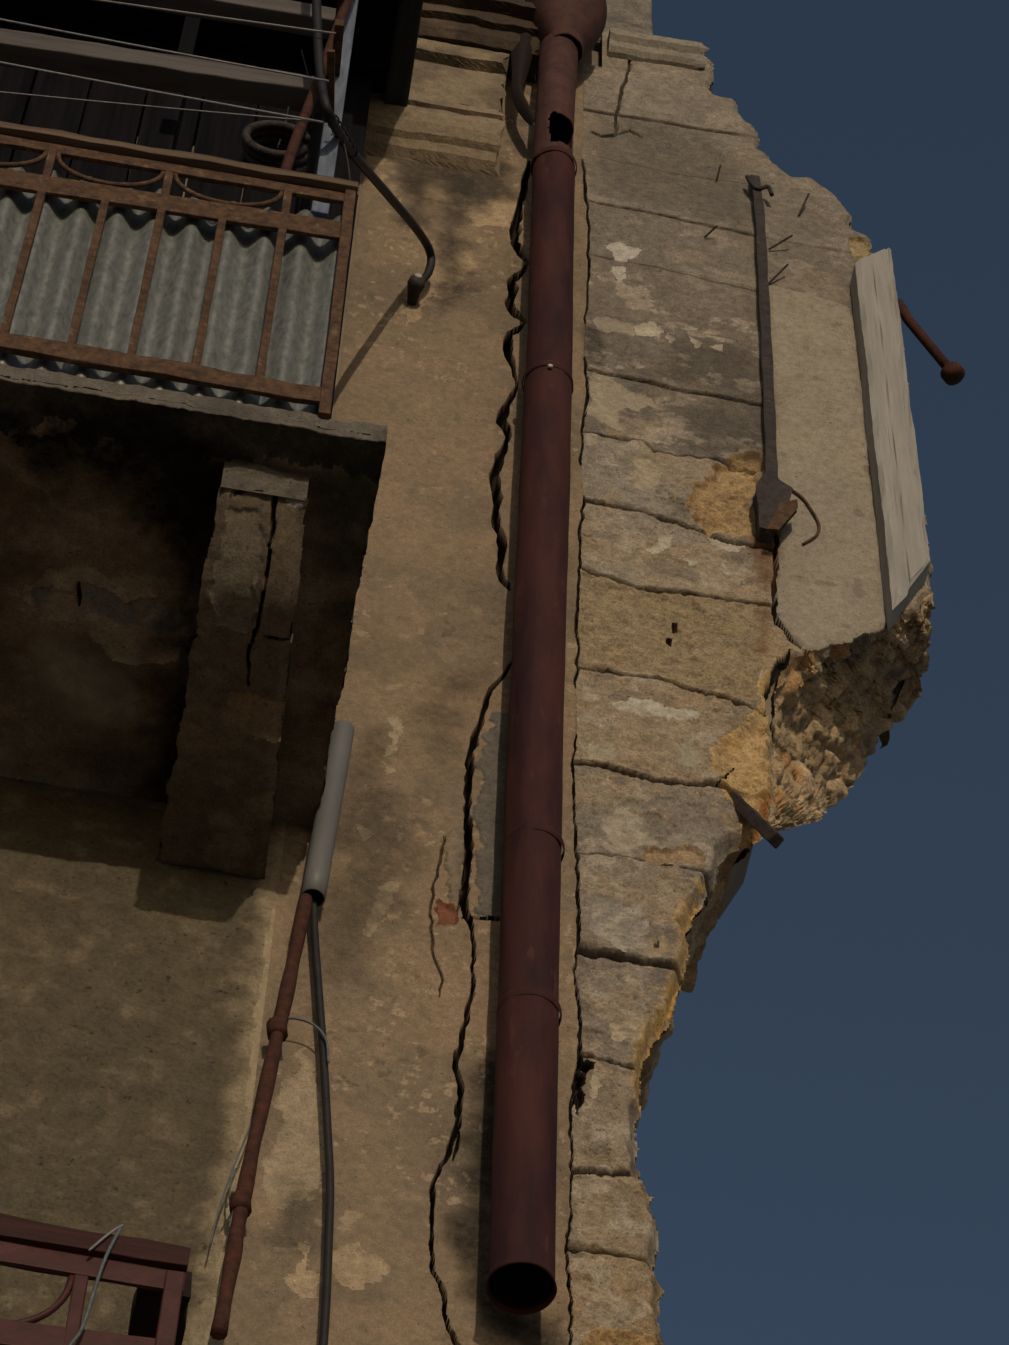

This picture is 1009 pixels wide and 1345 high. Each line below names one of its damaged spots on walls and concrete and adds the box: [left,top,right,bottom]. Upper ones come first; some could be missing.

crack [489,161,531,591]
flaking render [22,563,189,666]
leakage [145,456,223,803]
crack [246,495,292,686]
crack [764,534,801,737]
crack [428,663,512,1345]
spalling [573,571,936,1180]